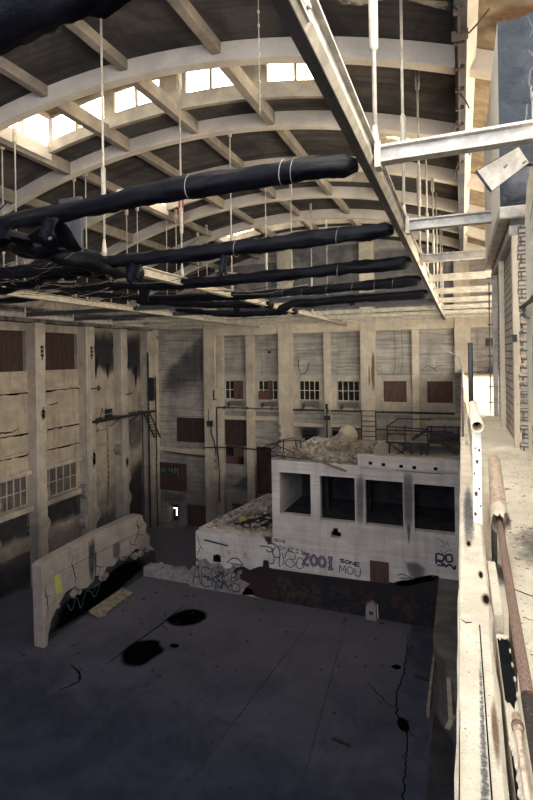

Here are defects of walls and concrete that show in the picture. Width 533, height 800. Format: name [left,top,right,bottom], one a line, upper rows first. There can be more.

efflorescence [410,0,447,9]
water stain [94,334,114,378]
water stain [127,337,141,387]
crack [45,519,143,615]
crack [60,664,81,690]
crack [368,633,420,800]
rust [511,711,531,800]